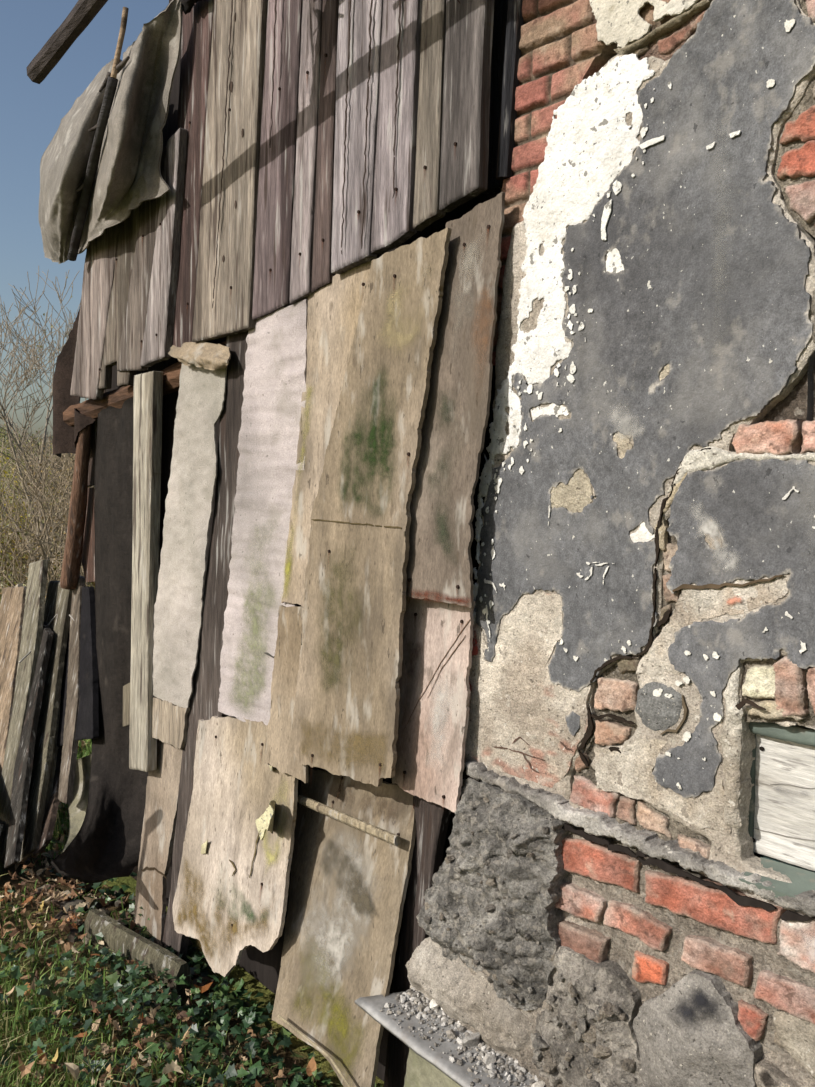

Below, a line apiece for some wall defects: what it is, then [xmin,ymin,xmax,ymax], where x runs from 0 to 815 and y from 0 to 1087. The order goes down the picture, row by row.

spalling [784,0,815,32]
spalling [775,77,815,238]
leakage [342,380,393,501]
peeling [465,0,713,788]
spalling [667,366,815,493]
crack [546,448,815,922]
peeling [594,656,815,834]
peeling [636,575,788,698]
spalling [555,836,815,1041]